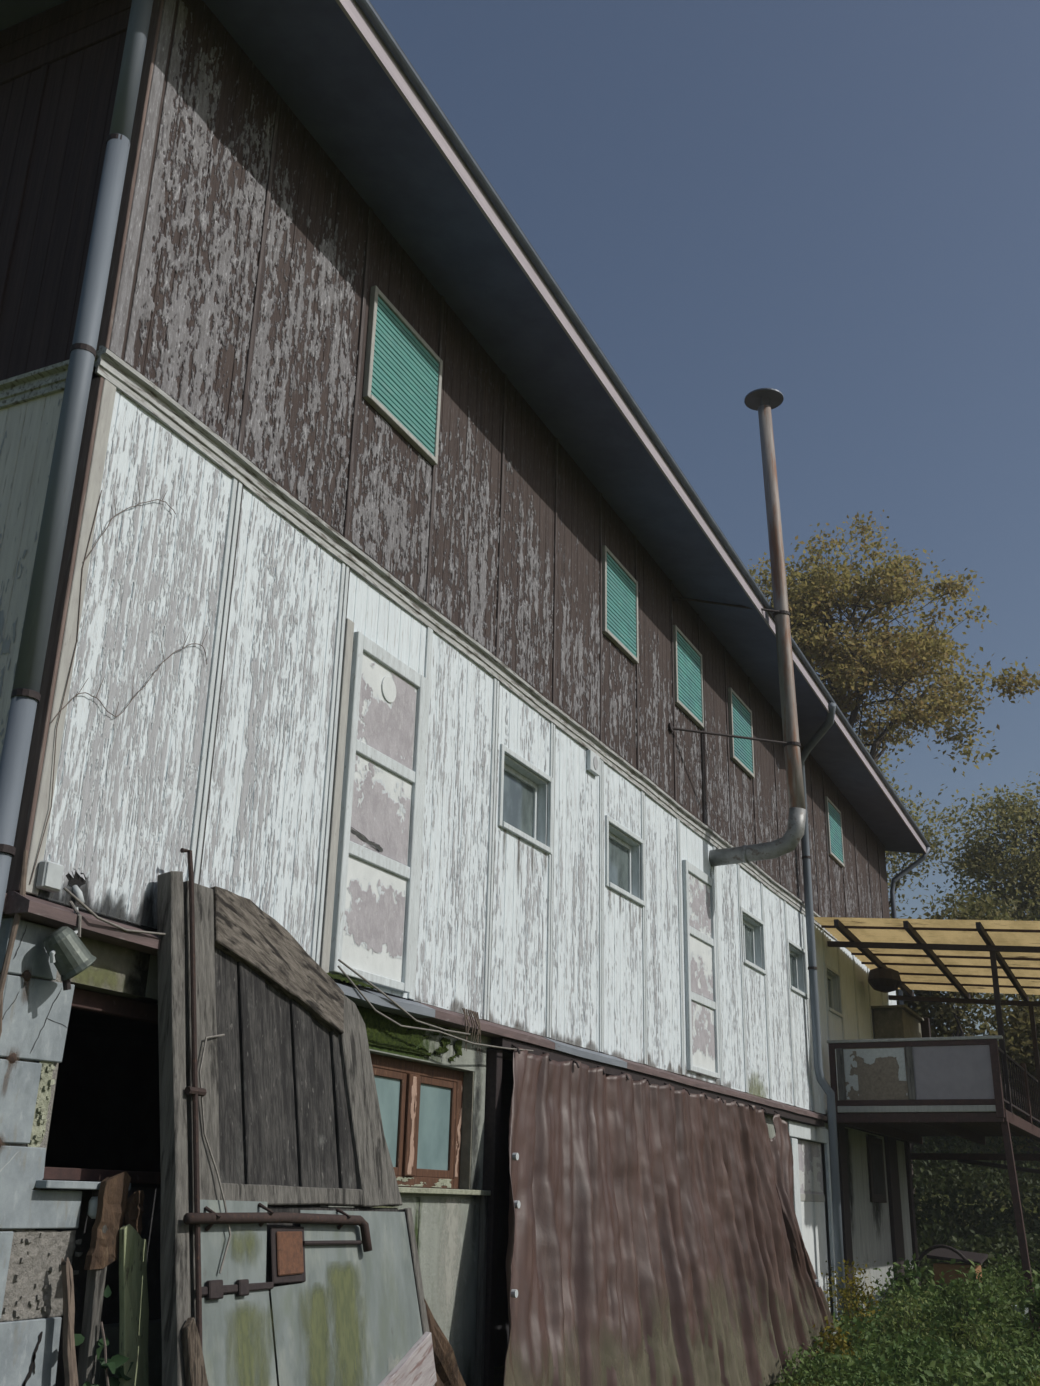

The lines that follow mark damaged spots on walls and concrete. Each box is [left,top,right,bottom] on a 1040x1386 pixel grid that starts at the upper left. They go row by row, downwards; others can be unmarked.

peeling [124,0,883,1109]
peeling [44,402,338,956]
leakage [514,1025,731,1088]
peeling [843,1048,907,1099]
crack [23,1331,43,1386]
leakage [236,1307,268,1386]
leakage [304,1264,362,1386]